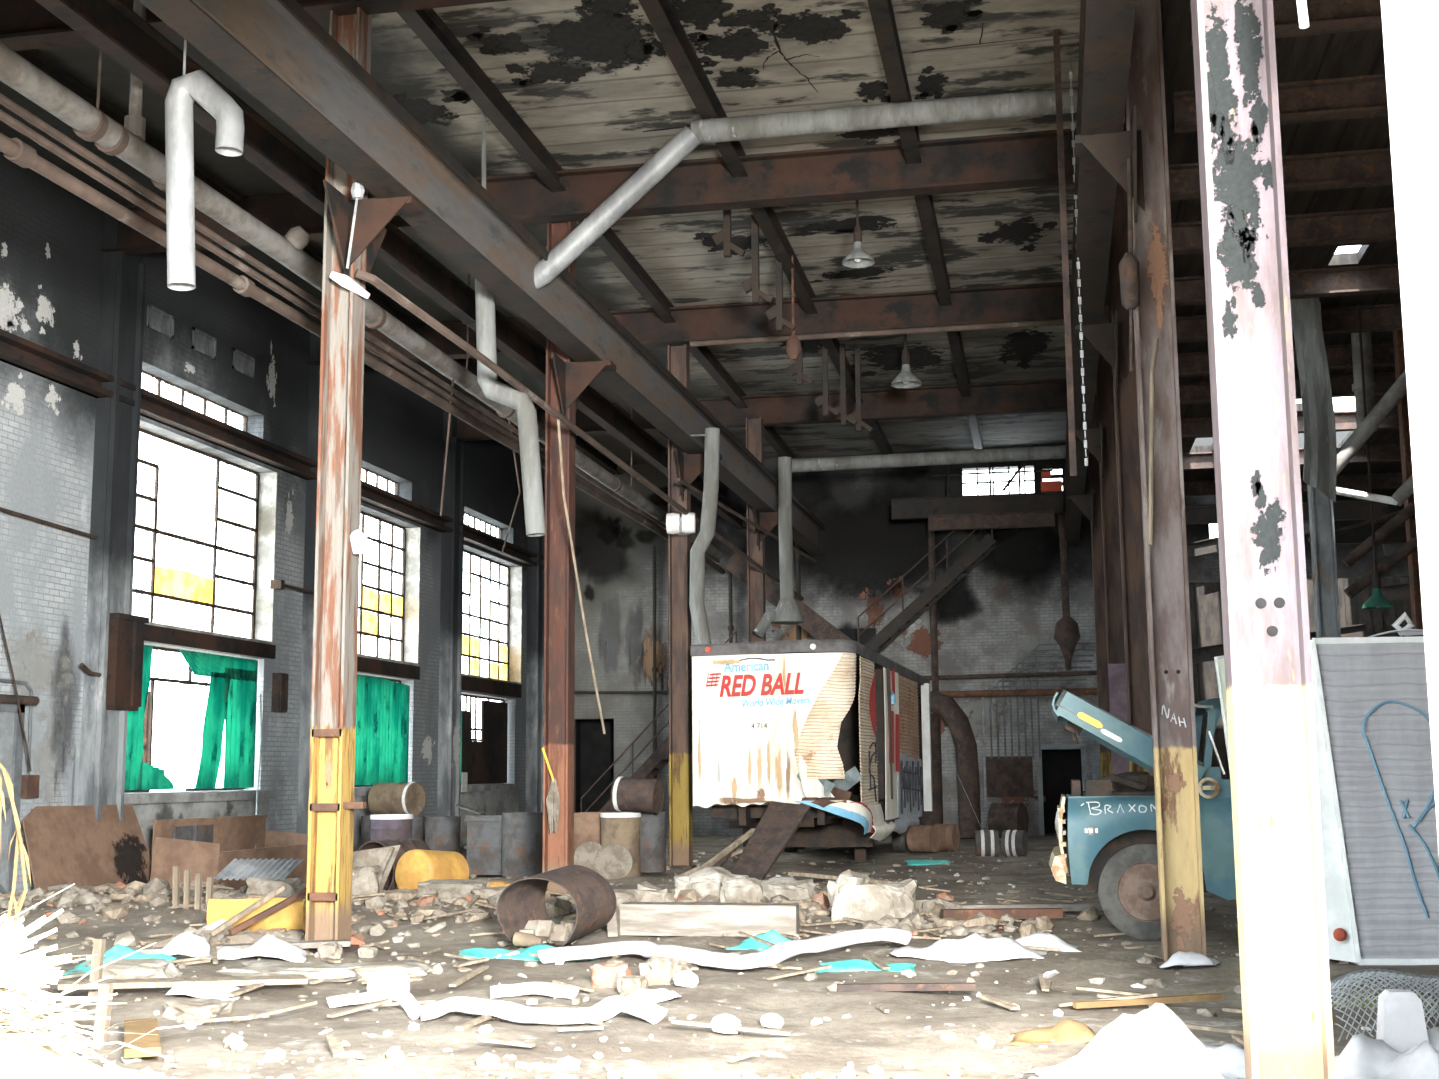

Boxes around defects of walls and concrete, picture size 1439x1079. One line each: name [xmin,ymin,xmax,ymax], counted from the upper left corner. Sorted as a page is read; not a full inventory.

peeling [467,0,667,88]
peeling [670,0,865,88]
peeling [918,0,983,34]
peeling [914,66,949,100]
peeling [835,127,901,145]
peeling [1202,0,1273,339]
peeling [786,215,898,237]
peeling [809,266,900,283]
corrosion [1145,218,1169,334]
peeling [0,283,55,335]
peeling [1250,470,1286,575]
corrosion [1169,887,1196,952]